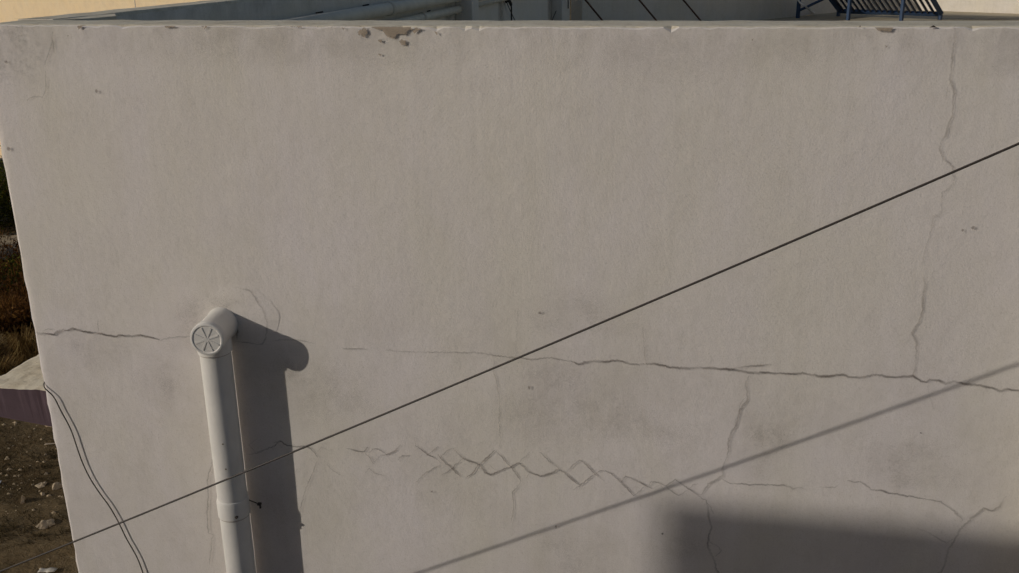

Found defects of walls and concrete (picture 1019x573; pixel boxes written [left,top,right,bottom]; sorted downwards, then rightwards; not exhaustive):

peeling [358,26,421,55]